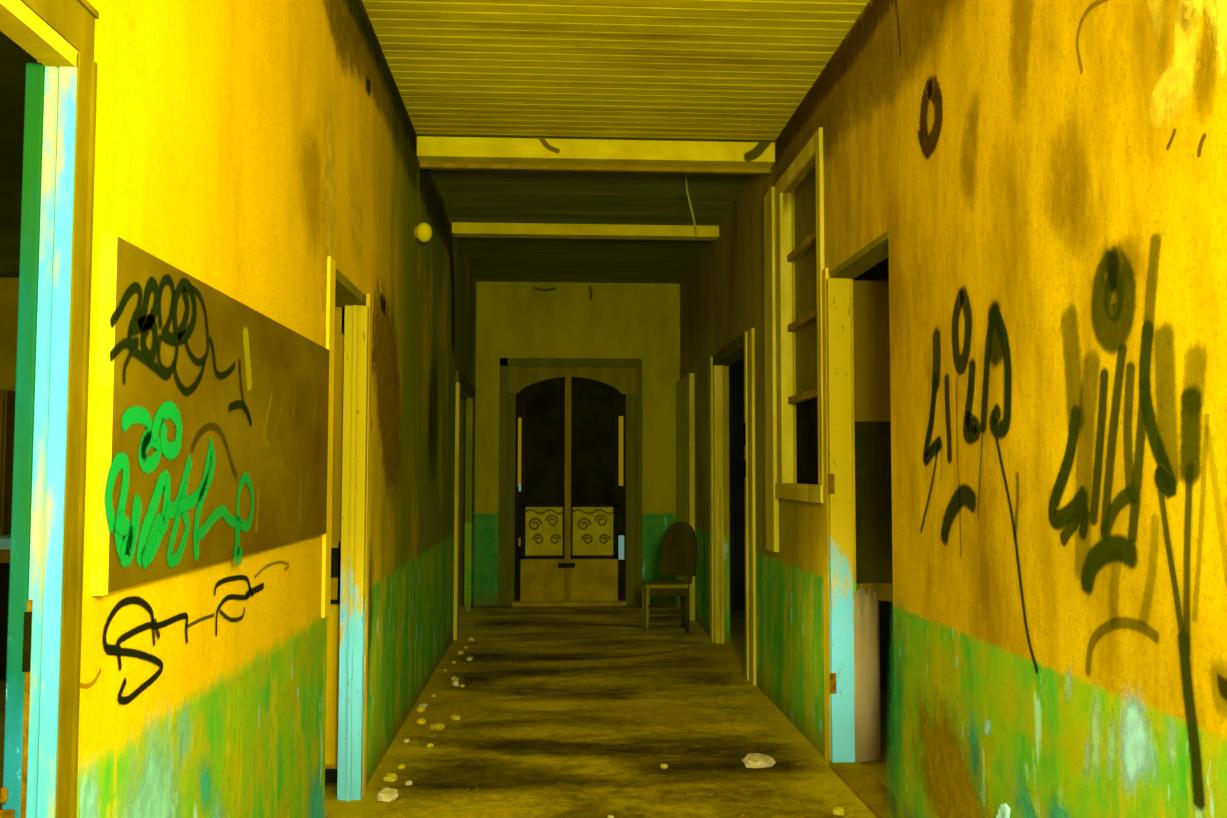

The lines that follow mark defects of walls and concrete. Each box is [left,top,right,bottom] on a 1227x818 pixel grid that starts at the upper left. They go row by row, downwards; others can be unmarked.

leakage [327,0,455,351]
leakage [408,736,789,791]
peeling [889,646,902,797]
peeling [919,703,1068,818]
peeling [1084,697,1177,788]